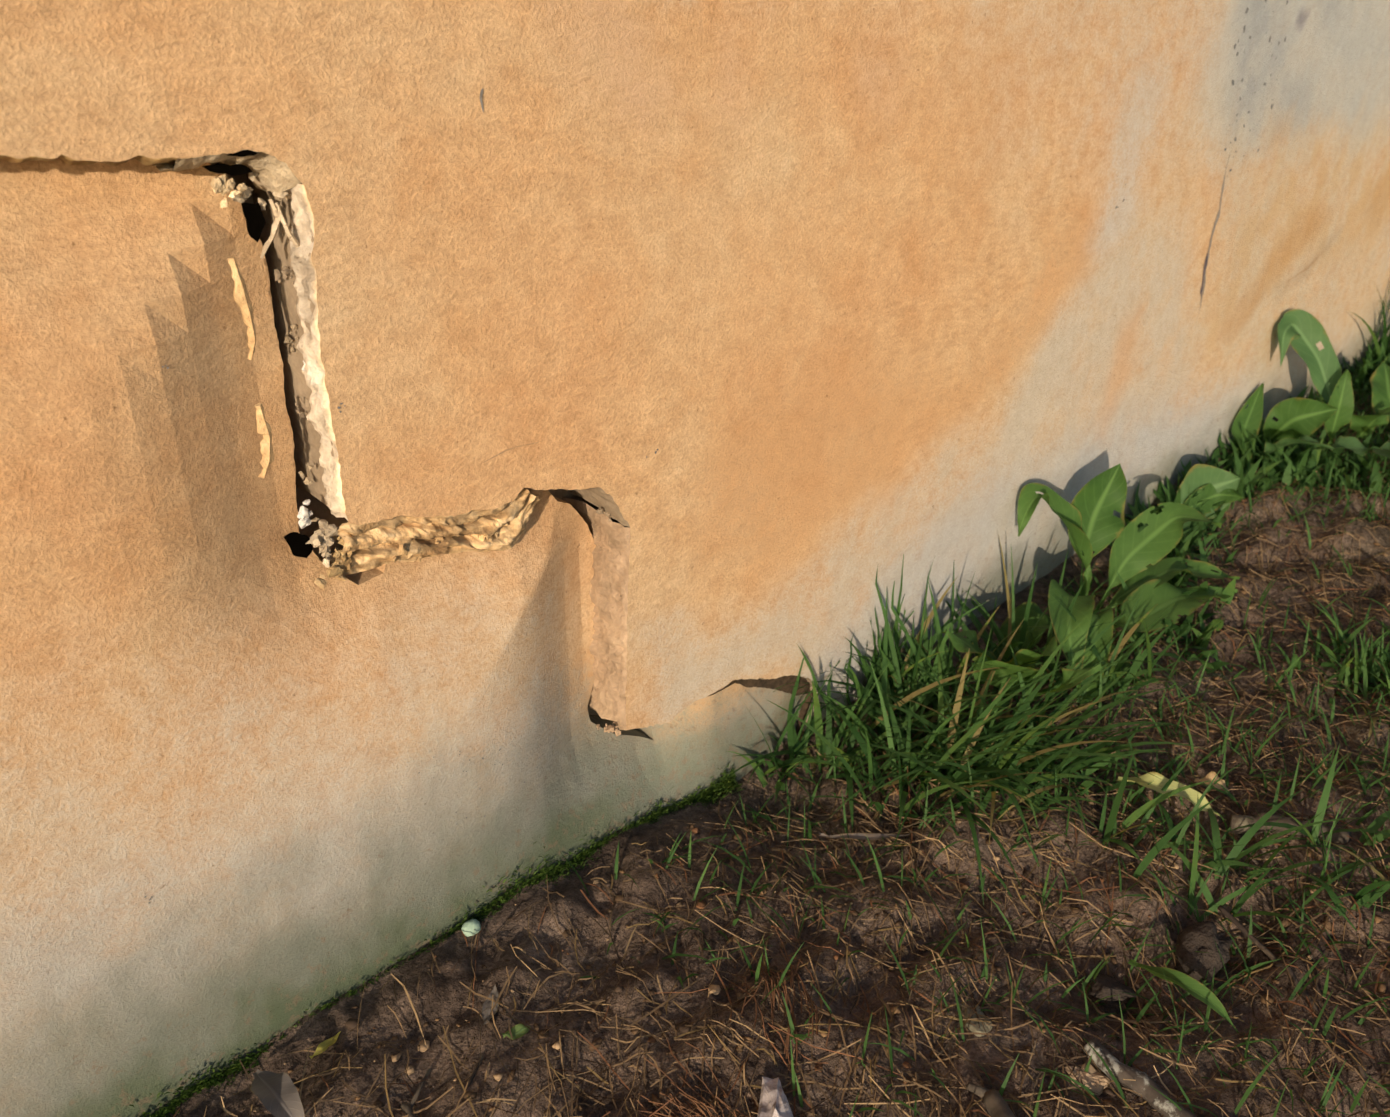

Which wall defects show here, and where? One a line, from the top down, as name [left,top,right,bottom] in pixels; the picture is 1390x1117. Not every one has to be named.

crack [0,149,630,737]
crack [734,675,813,733]
water stain [524,0,1390,829]
crack [1196,155,1230,322]